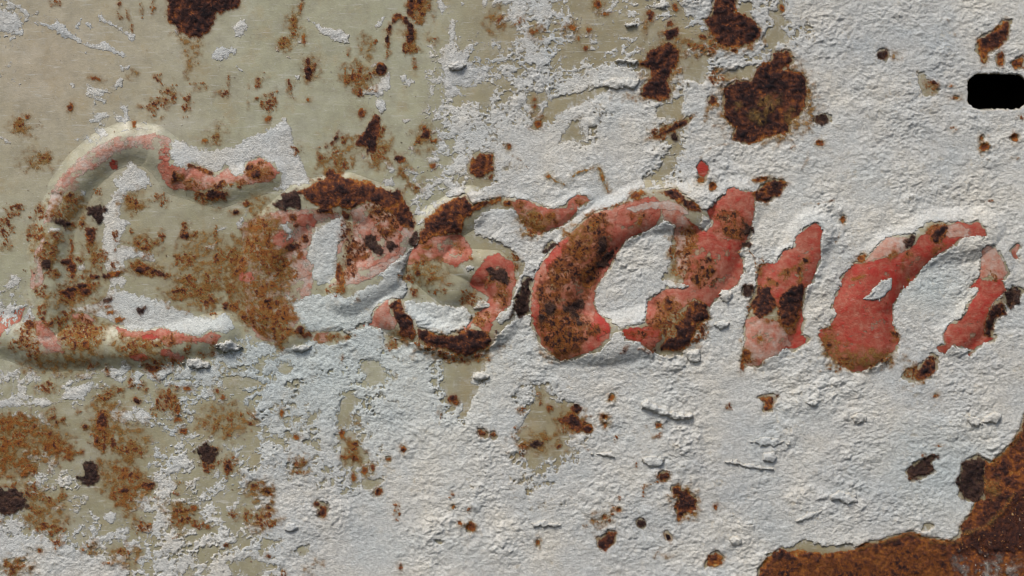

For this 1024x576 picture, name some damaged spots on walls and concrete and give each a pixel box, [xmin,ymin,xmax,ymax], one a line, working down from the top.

corrosion [628,0,761,101]
corrosion [648,50,815,144]
corrosion [977,21,1024,69]
peeling [0,0,310,353]
peeling [400,0,680,298]
peeling [236,209,348,299]
corrosion [0,0,701,551]
peeling [594,196,689,329]
corrosion [742,258,808,335]
peeling [0,364,110,427]
peeling [18,449,88,513]
corrosion [759,423,1024,576]